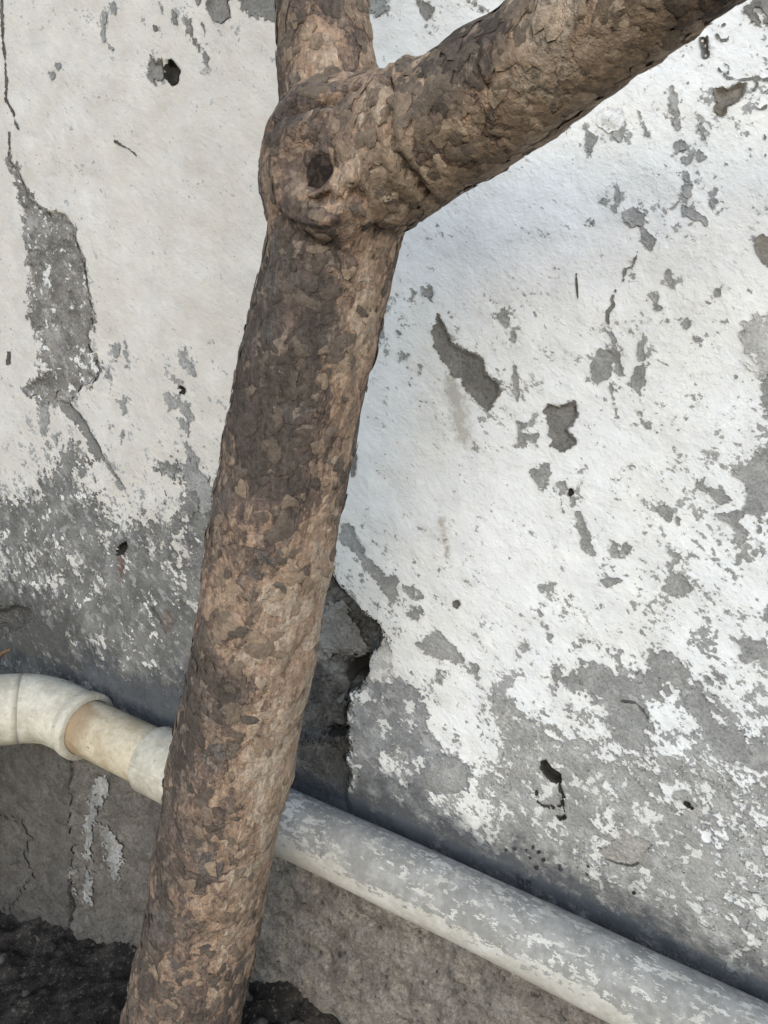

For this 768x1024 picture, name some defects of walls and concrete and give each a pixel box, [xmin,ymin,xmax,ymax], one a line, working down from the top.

crack [0,0,19,160]
spalling [713,82,747,116]
peeling [668,85,720,226]
peeling [598,185,657,251]
spalling [430,313,520,412]
peeling [590,331,647,418]
peeling [0,154,213,722]
spalling [515,400,577,453]
peeling [529,462,596,555]
peeling [692,448,768,545]
peeling [339,523,425,622]
peeling [290,573,768,986]